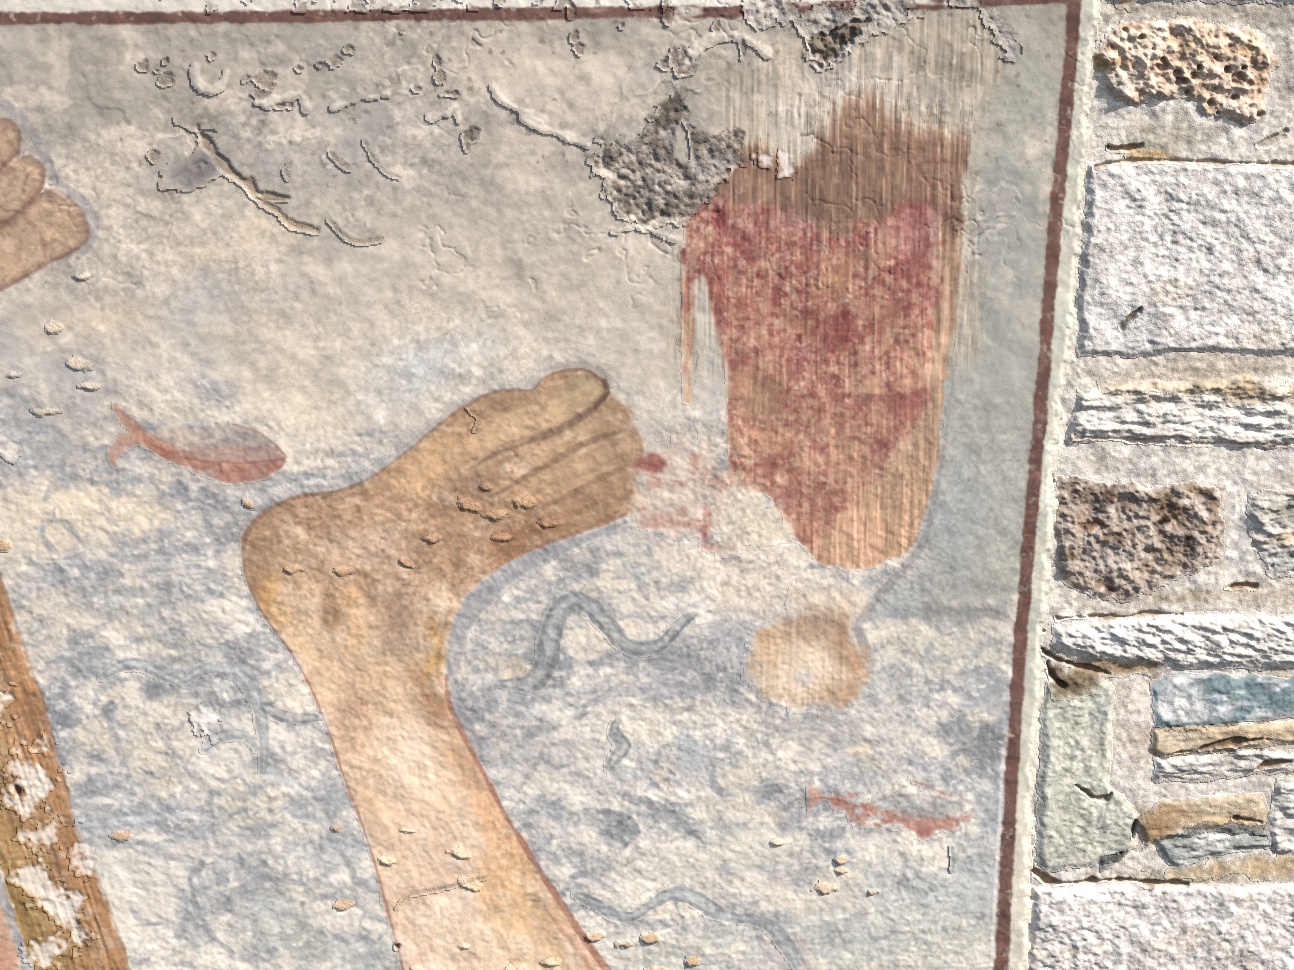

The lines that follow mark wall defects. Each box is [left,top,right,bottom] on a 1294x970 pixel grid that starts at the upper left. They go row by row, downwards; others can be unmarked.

peeling [335,0,438,13]
peeling [456,0,506,11]
spalling [949,0,1025,62]
spalling [294,44,355,73]
peeling [136,50,312,114]
peeling [329,88,393,112]
spalling [411,54,481,153]
spalling [489,0,928,243]
peeling [66,354,101,391]
peeling [0,537,12,552]
peeling [0,670,133,970]
peeling [333,897,355,911]